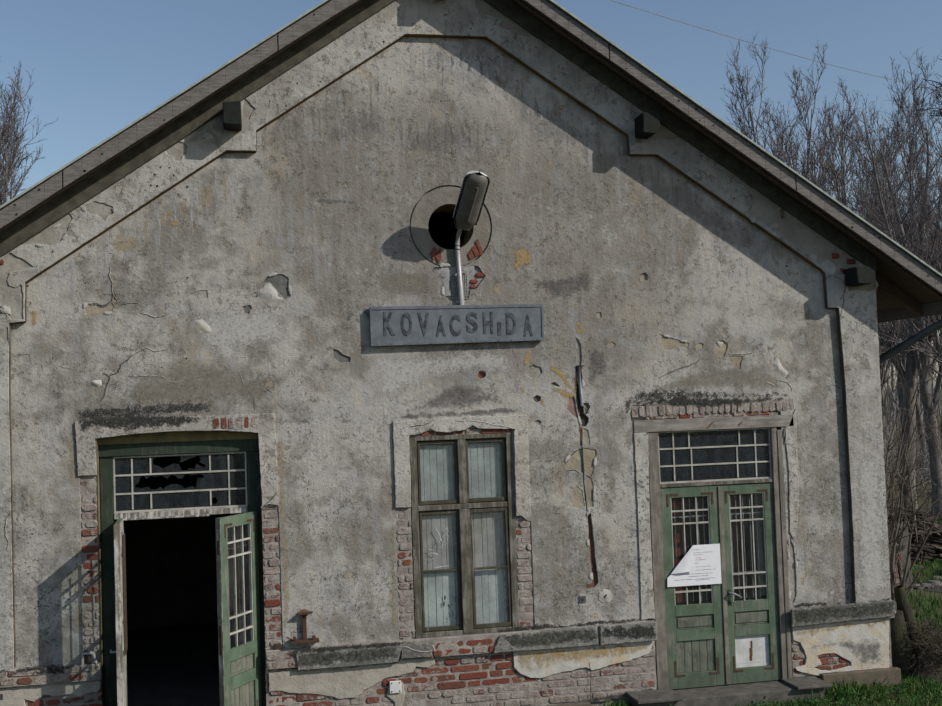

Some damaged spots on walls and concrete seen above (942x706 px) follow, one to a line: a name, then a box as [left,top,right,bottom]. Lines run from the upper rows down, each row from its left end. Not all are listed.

crack [91,267,164,318]
spalling [261,273,292,299]
spalling [430,239,485,303]
water stain [199,307,287,360]
crack [100,347,201,401]
water stain [78,366,263,431]
water stain [626,369,787,413]
flaking render [80,476,101,652]
flaking render [262,506,657,706]
water stain [293,641,412,654]
flaking render [790,627,851,677]
flaking render [0,664,104,706]